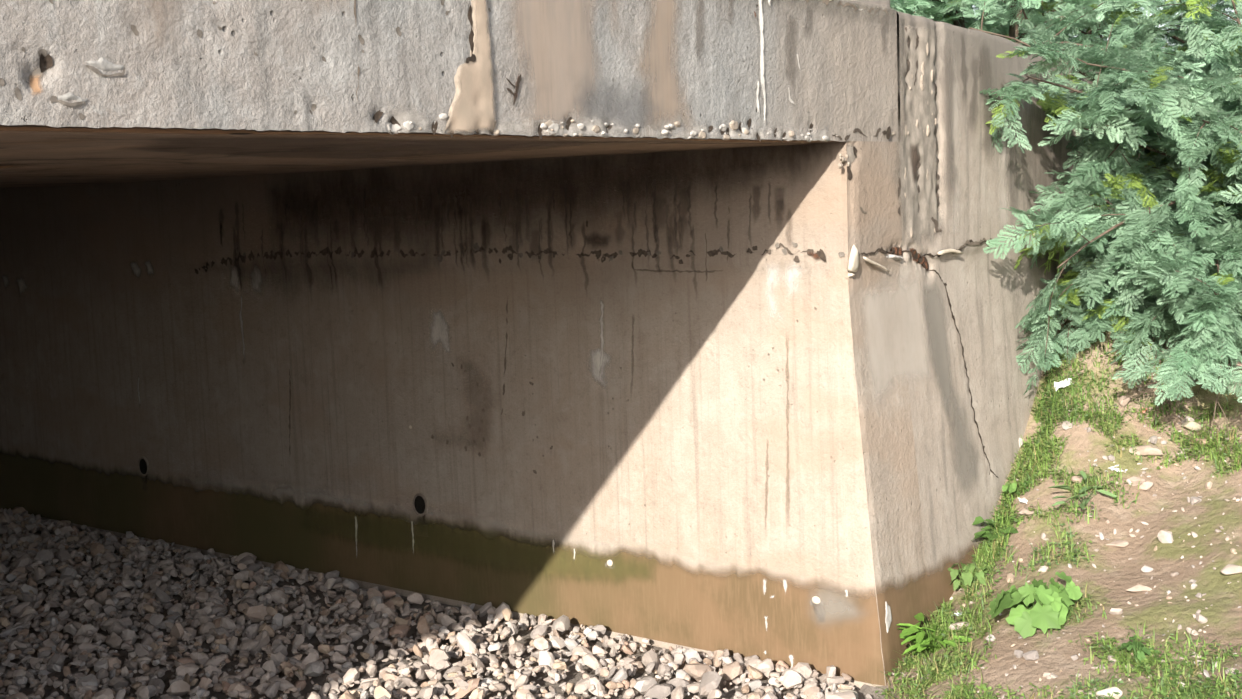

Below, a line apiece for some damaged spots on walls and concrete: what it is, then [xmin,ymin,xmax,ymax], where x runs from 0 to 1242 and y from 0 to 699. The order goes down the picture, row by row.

flaking render [373,0,829,142]
damp [754,0,770,120]
damp [143,138,808,233]
spalling [838,145,857,180]
crack [195,187,1025,478]
damp [0,450,981,686]